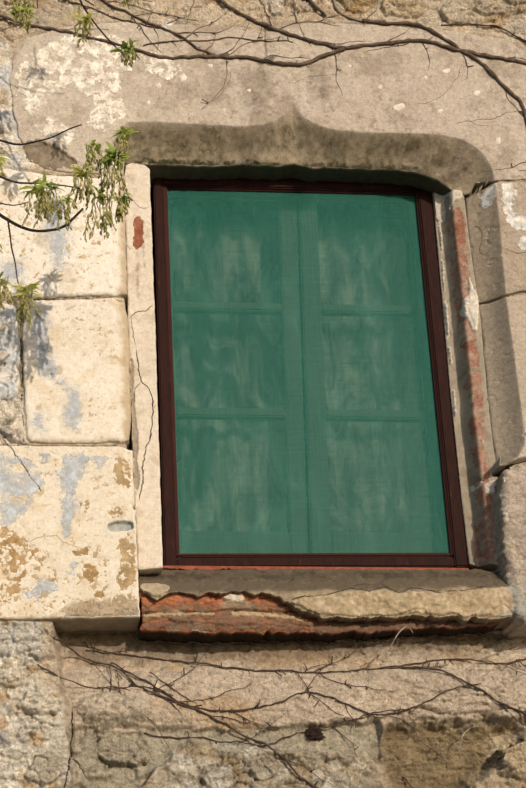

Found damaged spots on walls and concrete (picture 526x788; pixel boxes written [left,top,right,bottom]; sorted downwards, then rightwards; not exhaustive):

peeling [0,34,182,287]
peeling [480,183,526,251]
crack [1,298,154,499]
flaking render [434,190,508,566]
spalling [222,586,514,622]
crack [63,710,87,788]